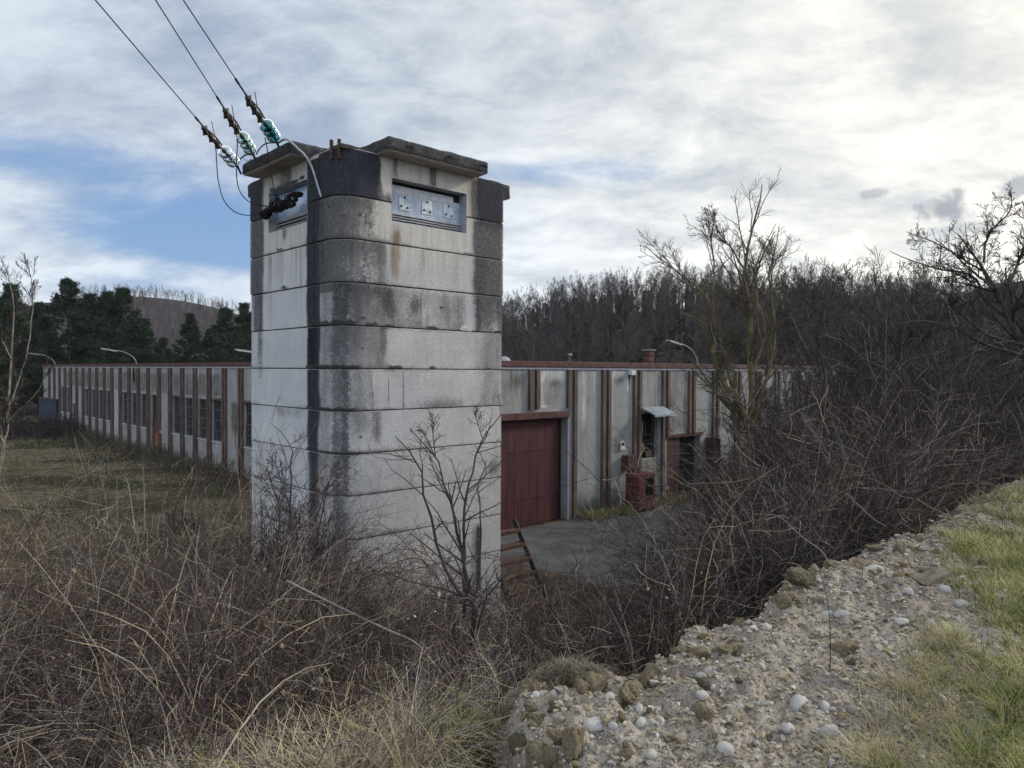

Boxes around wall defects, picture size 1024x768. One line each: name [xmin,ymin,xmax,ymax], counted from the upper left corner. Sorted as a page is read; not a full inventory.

leakage [250,169,294,363]
leakage [300,149,462,569]
leakage [472,178,503,398]